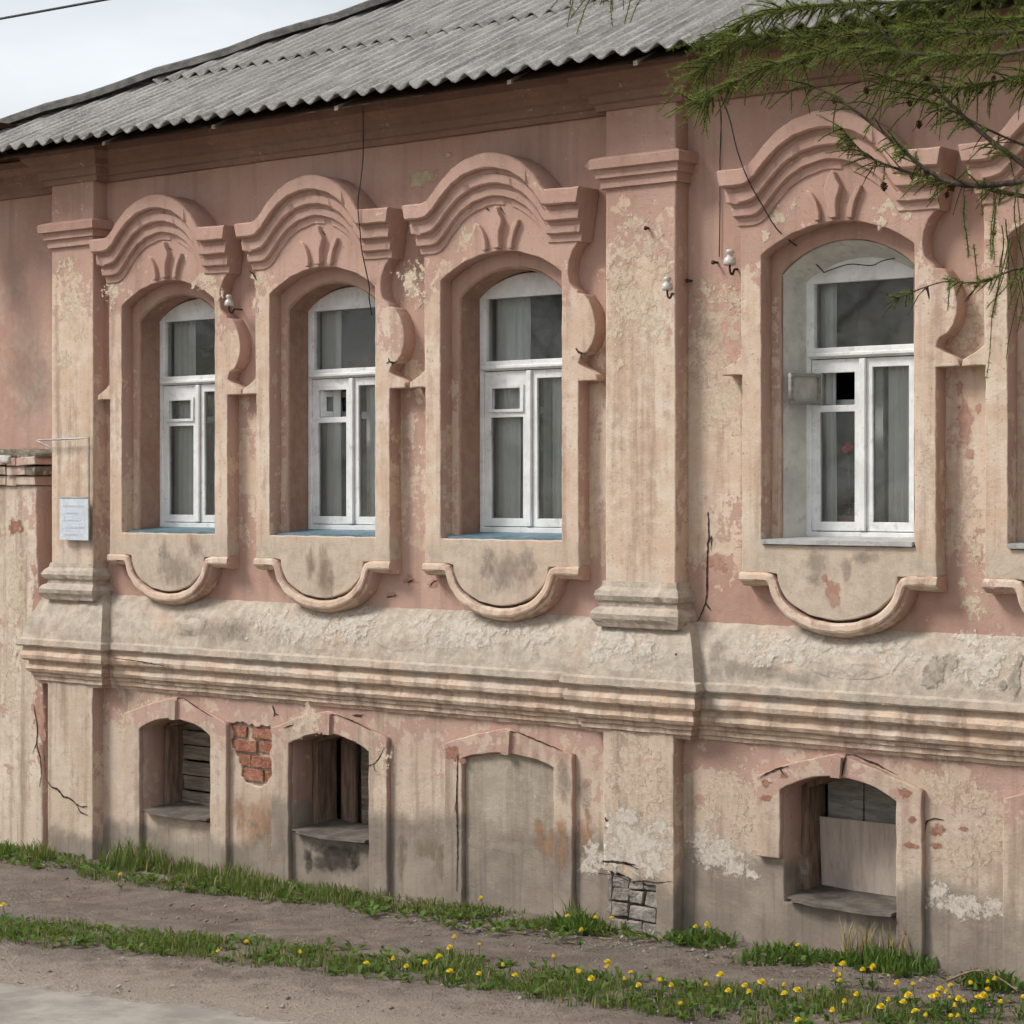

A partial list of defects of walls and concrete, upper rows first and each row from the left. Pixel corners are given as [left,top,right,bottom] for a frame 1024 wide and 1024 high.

peeling [390,259,429,310]
peeling [606,212,674,371]
crack [697,512,712,622]
peeling [822,573,840,608]
crack [33,708,88,816]
spalling [231,722,272,786]
crack [328,714,384,770]
crack [760,766,788,778]
crack [841,754,897,776]
spalling [607,872,657,936]